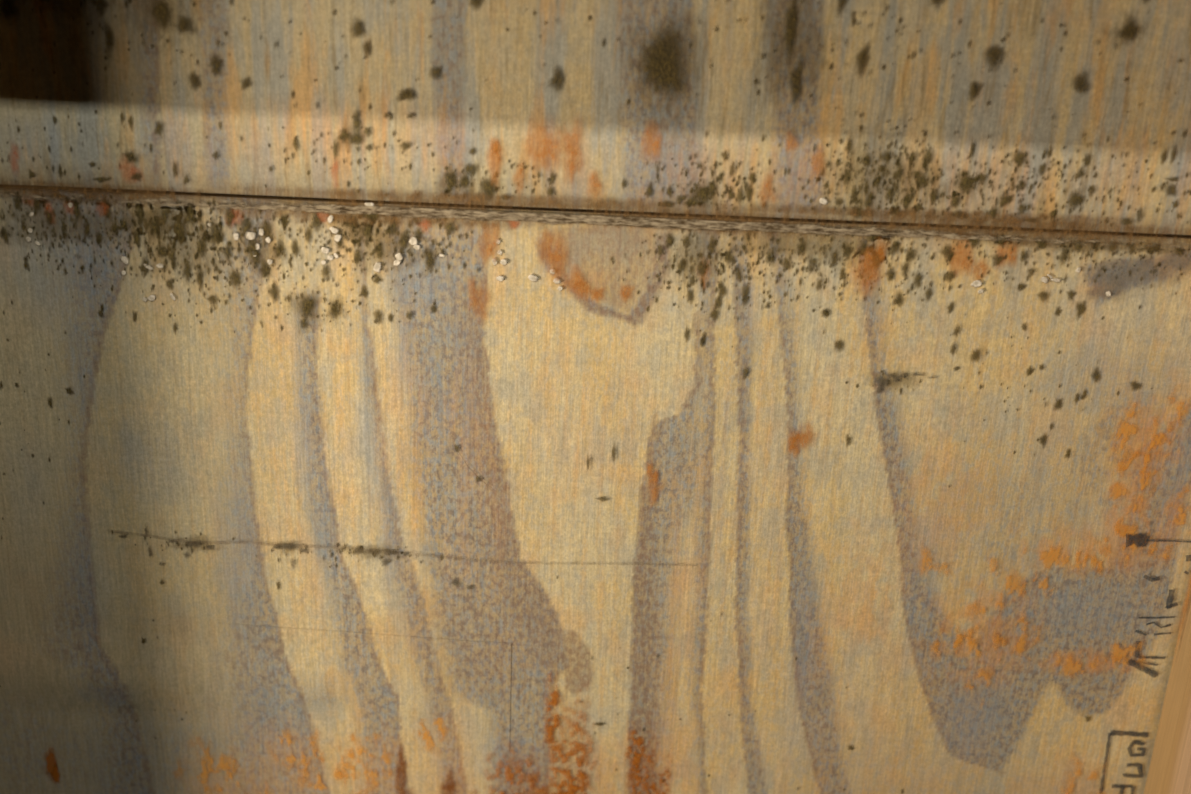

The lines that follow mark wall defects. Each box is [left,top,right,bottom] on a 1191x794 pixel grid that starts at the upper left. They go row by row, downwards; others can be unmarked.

damp [342,22,369,59]
damp [761,0,811,103]
damp [846,47,893,74]
damp [398,90,414,101]
damp [1,105,1191,332]
corrosion [1117,411,1166,490]
damp [323,544,422,568]
corrosion [1034,522,1137,589]
corrosion [1057,644,1135,674]
corrosion [45,751,60,782]
corrosion [487,691,591,794]
corrosion [627,731,669,794]